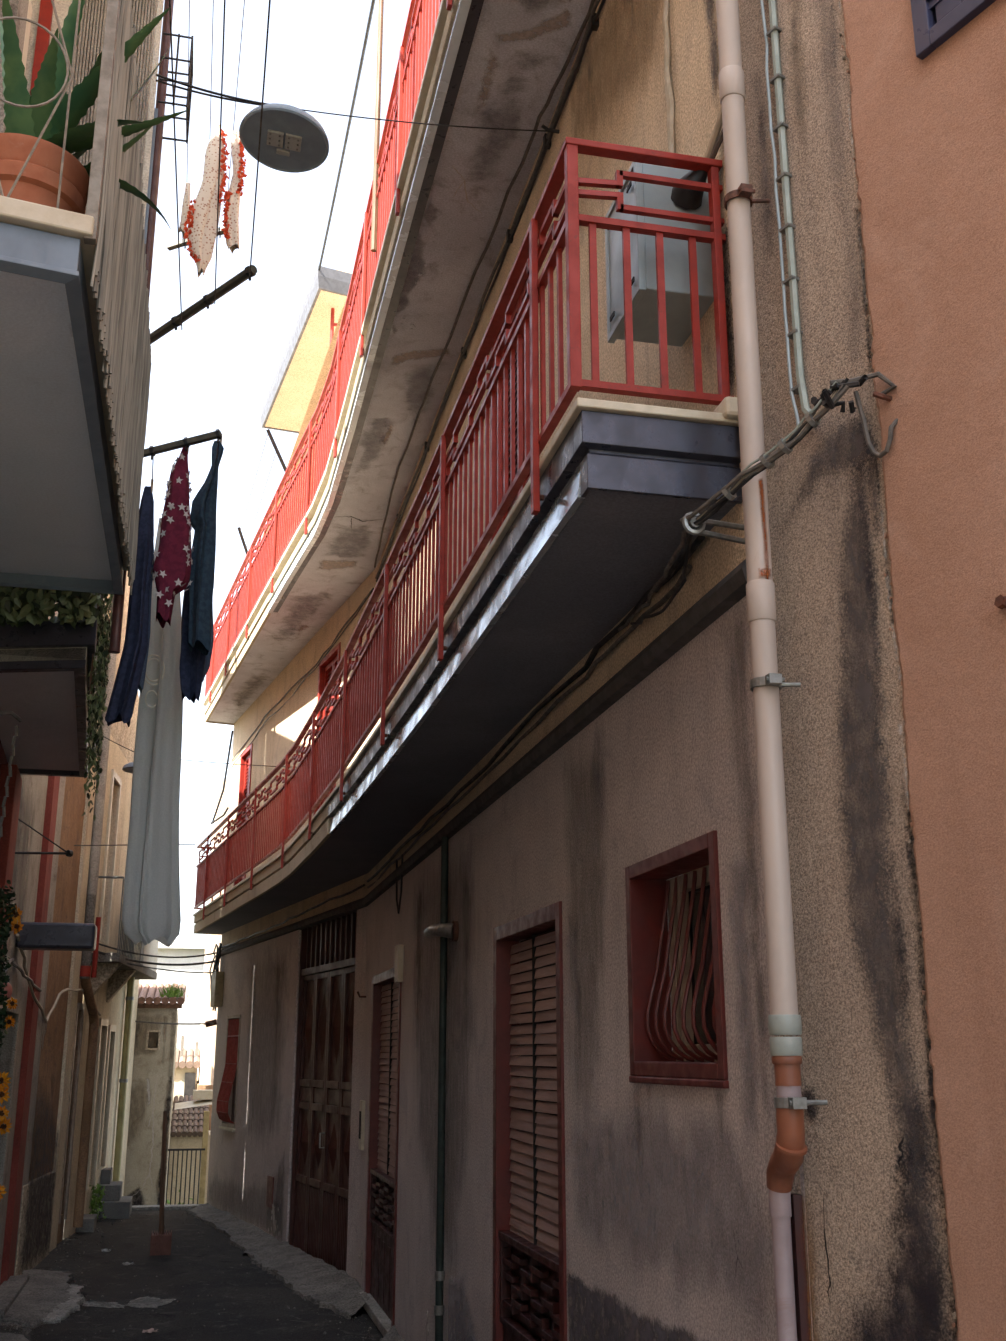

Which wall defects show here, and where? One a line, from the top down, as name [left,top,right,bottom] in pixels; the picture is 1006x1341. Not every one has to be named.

water stain [567,1274,695,1341]
water stain [834,431,955,1341]